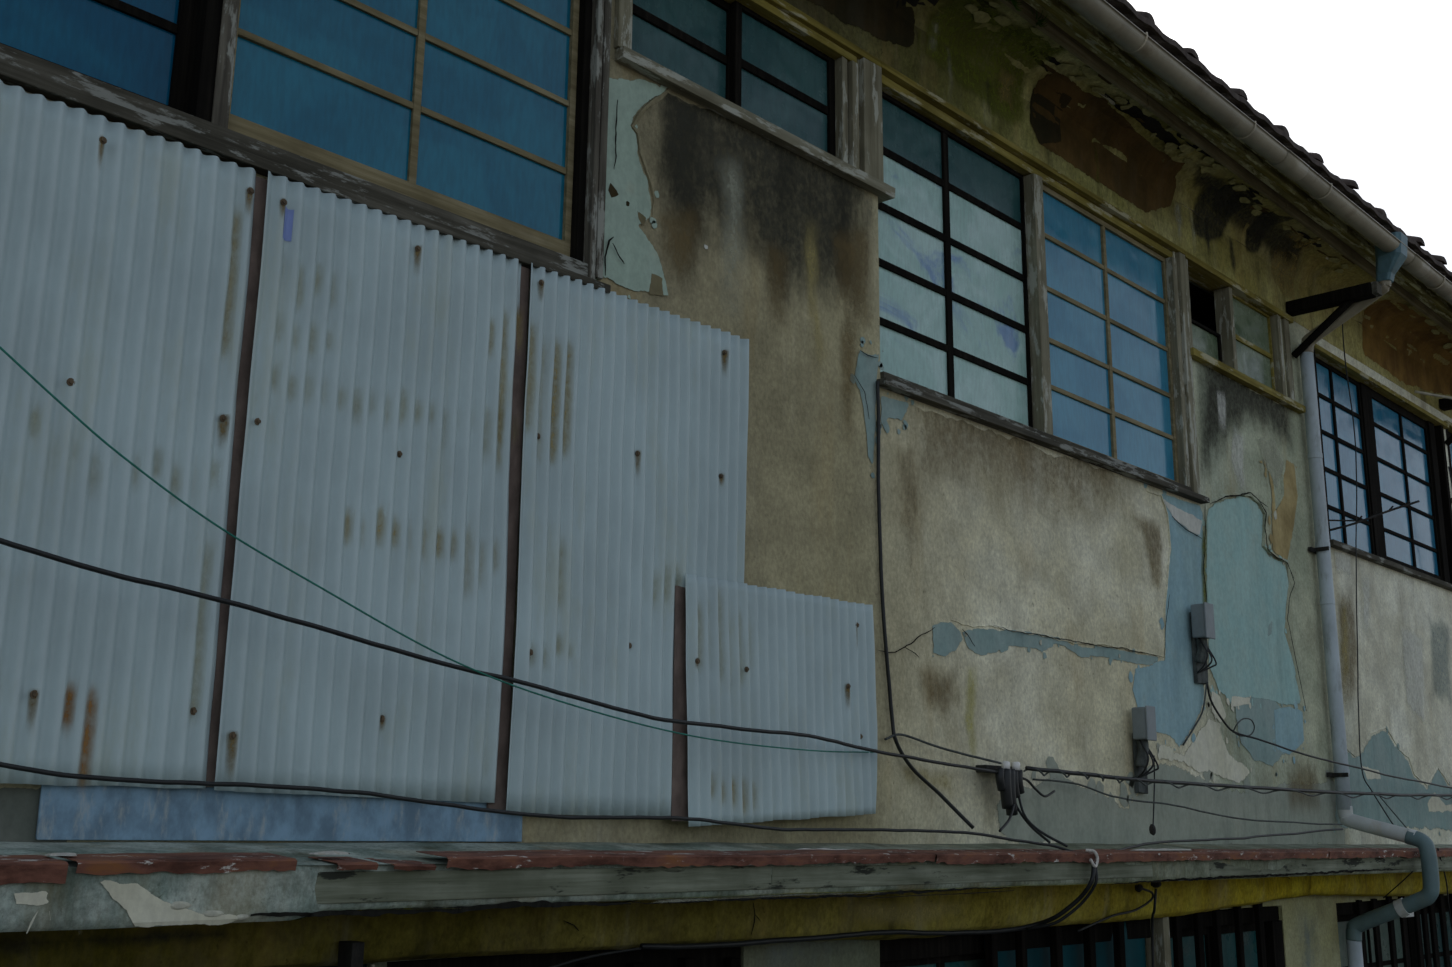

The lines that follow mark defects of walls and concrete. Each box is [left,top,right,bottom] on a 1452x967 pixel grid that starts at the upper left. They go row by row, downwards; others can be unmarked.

spalling [808,0,939,47]
spalling [964,0,1355,273]
peeling [595,78,673,299]
damp [665,93,865,294]
damp [1176,173,1304,267]
spalling [1362,278,1452,395]
rust [219,416,228,436]
spalling [933,459,1452,844]
rust [63,689,94,780]
rust [228,734,237,761]
peeling [14,891,49,906]
spalling [101,880,249,927]